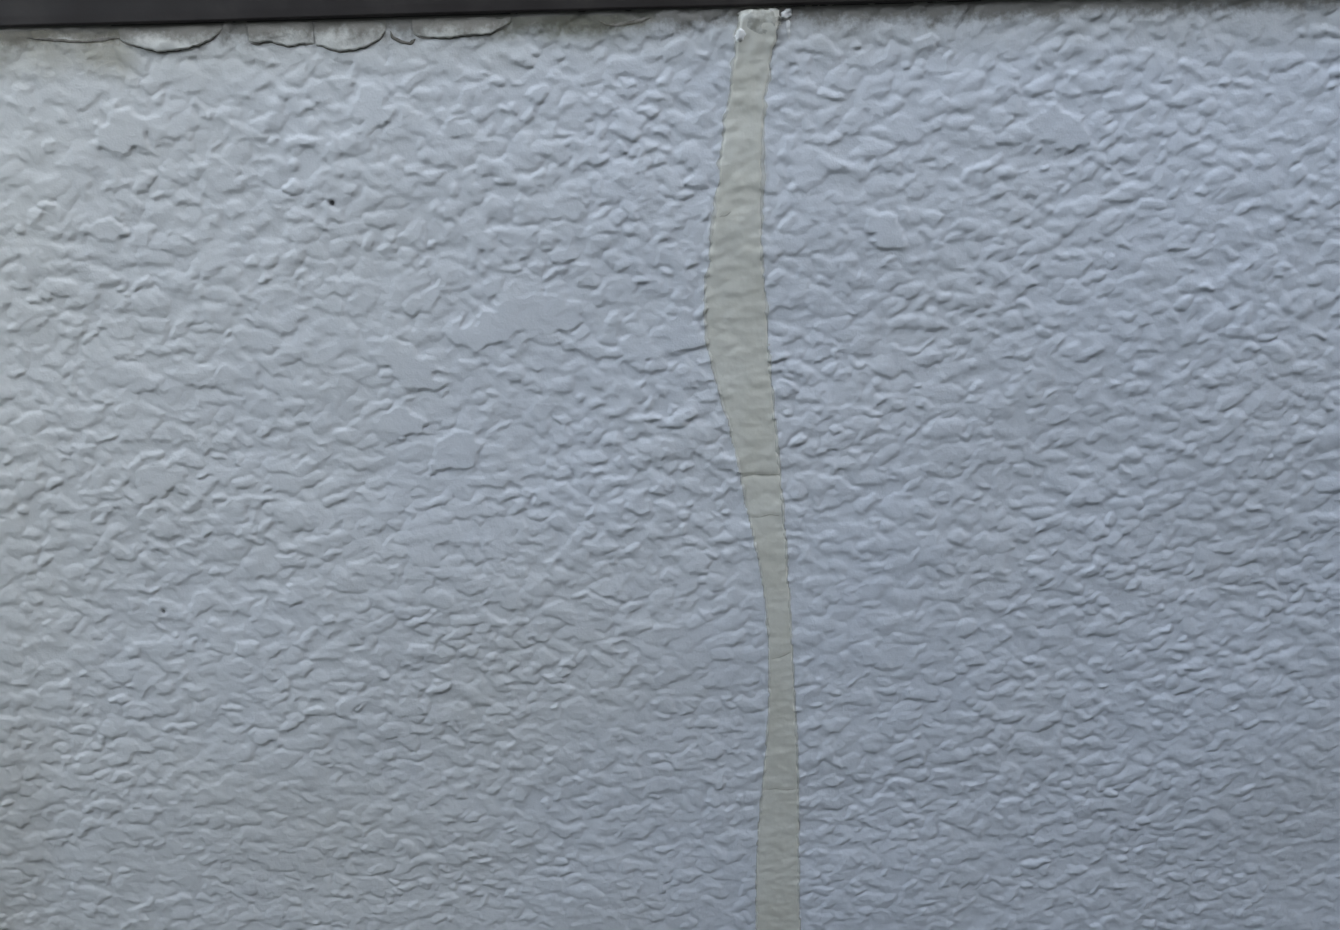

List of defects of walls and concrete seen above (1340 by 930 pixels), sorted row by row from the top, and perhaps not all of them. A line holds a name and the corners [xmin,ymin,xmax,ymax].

crack [26,36,120,44]